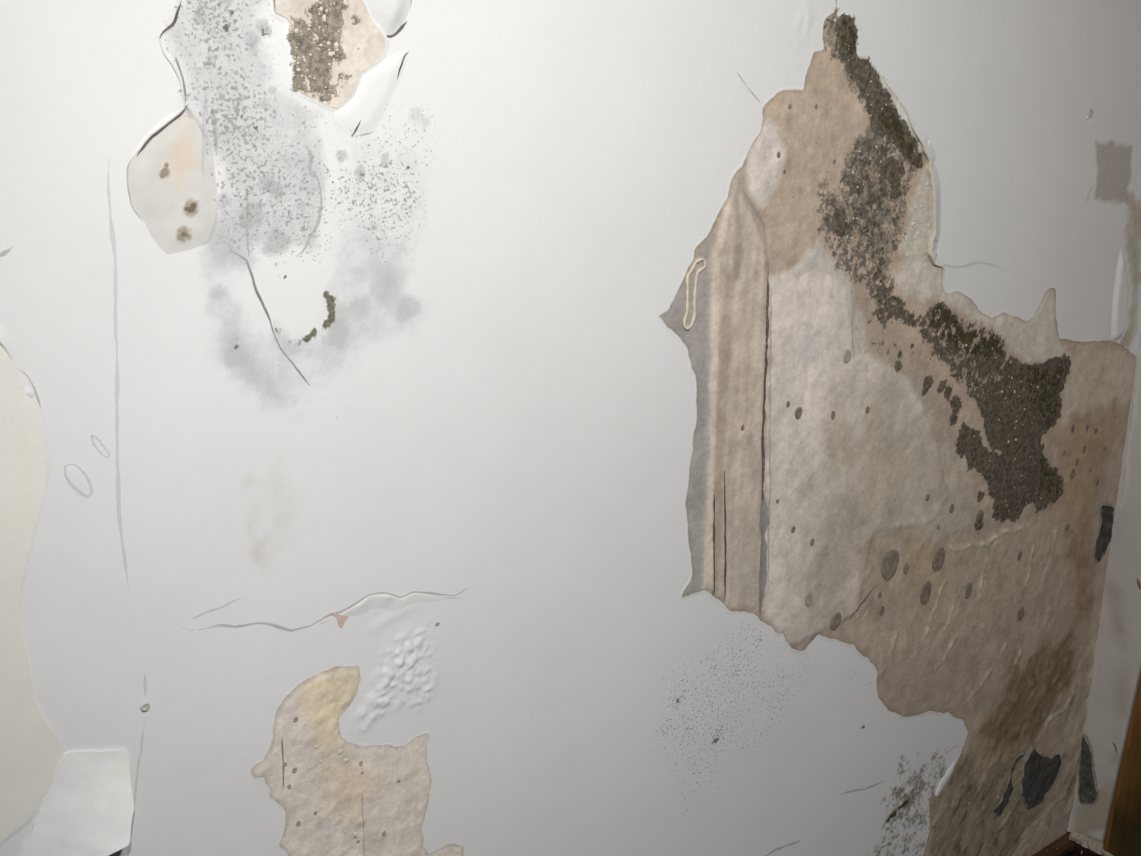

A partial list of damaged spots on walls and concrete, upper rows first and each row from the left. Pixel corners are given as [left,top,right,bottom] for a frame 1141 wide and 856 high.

peeling [127,0,218,254]
mould [167,0,427,319]
mould [303,291,358,346]
peeling [269,0,410,137]
peeling [657,5,1137,856]
mould [817,7,1071,534]
peeling [0,323,134,856]
peeling [249,664,465,856]
mould [878,756,945,856]